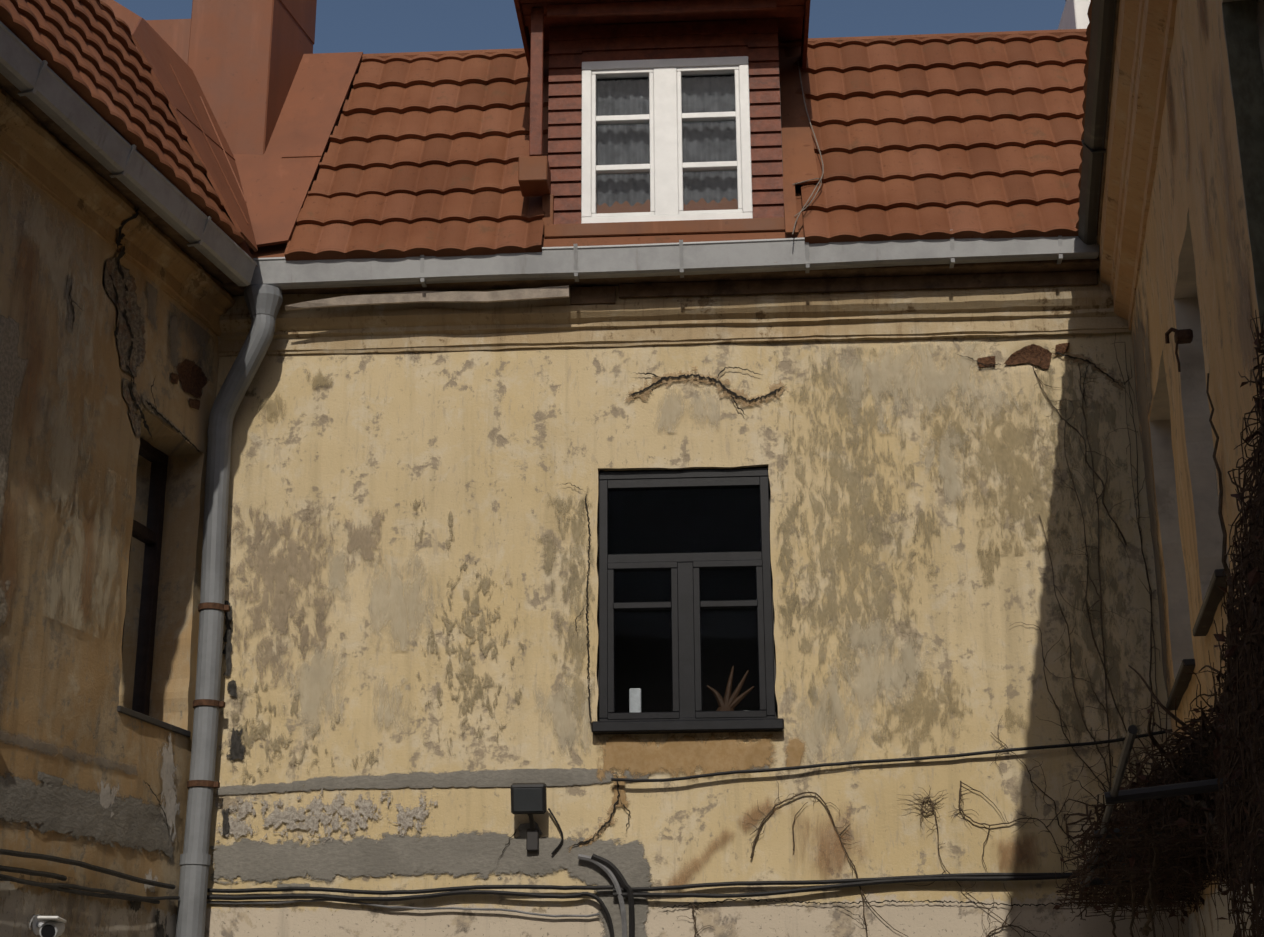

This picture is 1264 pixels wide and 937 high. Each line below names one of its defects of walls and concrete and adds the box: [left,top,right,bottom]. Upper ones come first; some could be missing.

crack [66,276,83,334]
crack [109,208,199,452]
spalling [171,359,209,410]
peeling [215,506,438,845]
peeling [445,511,454,554]
peeling [411,545,524,753]
peeling [539,488,595,745]
crack [625,366,789,416]
peeling [777,347,972,762]
peeling [920,383,1074,586]
spalling [977,343,1070,369]
crack [568,770,631,852]